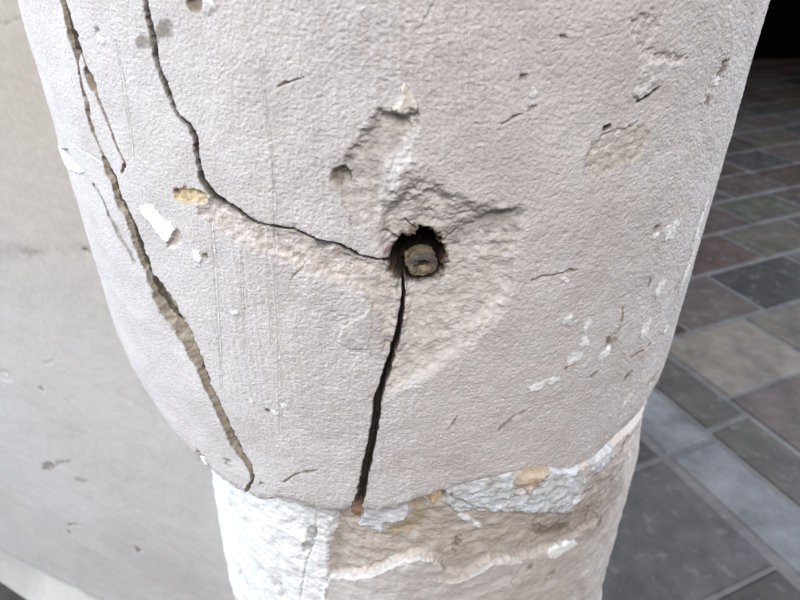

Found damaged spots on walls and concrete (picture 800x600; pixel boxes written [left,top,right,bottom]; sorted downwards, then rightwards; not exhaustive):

crack [145,0,314,238]
crack [60,0,255,492]
peeling [167,228,183,249]
spalling [199,83,519,394]
corrosion [384,224,448,280]
crack [337,243,410,504]
spalling [325,490,602,600]
peeling [585,436,628,473]